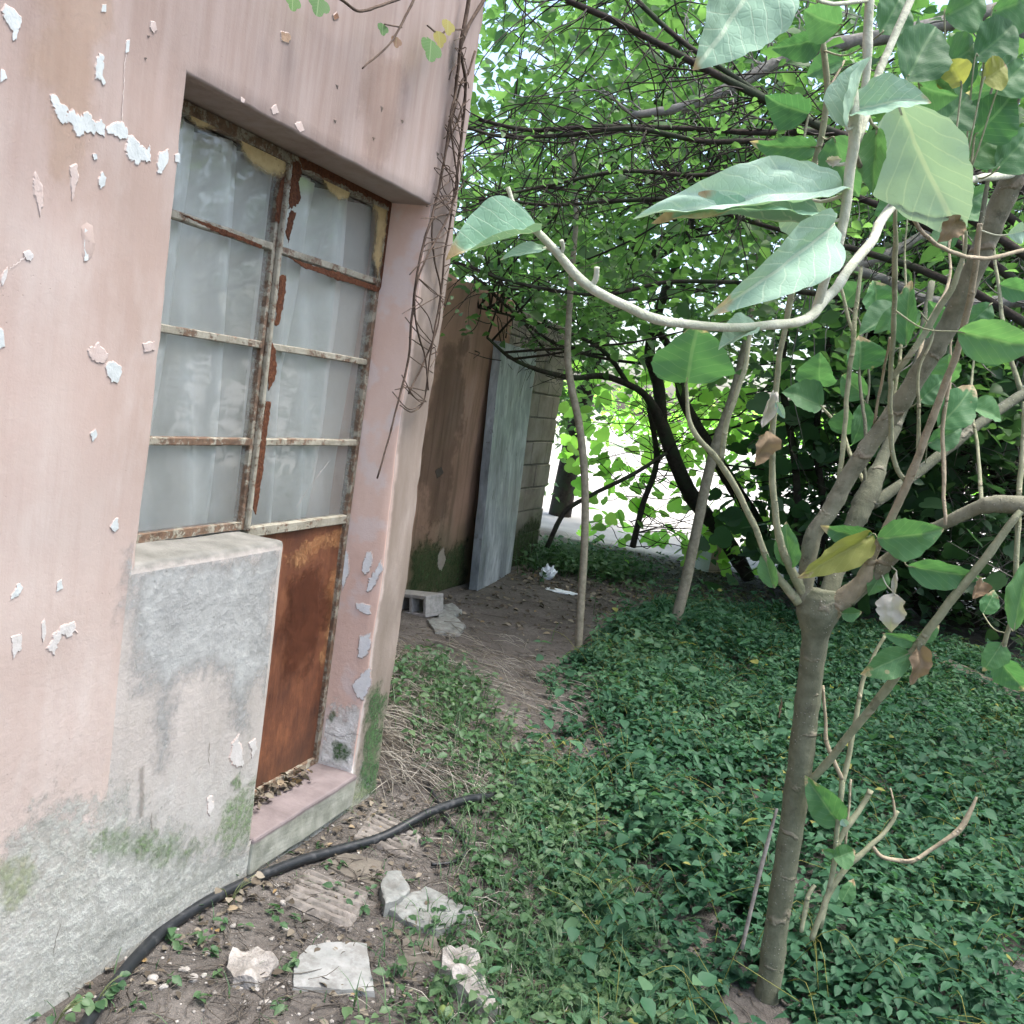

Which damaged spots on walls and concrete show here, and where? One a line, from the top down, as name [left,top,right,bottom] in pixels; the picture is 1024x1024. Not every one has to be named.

peeling [49,93,180,175]
corrosion [182,214,262,248]
corrosion [275,157,392,292]
corrosion [274,275,287,326]
peeling [87,342,122,384]
corrosion [253,343,277,515]
peeling [41,618,78,656]
flaking render [128,550,280,768]
corrosion [282,531,342,675]
peeling [342,550,384,615]
leakage [332,742,351,761]
leakage [215,777,256,850]